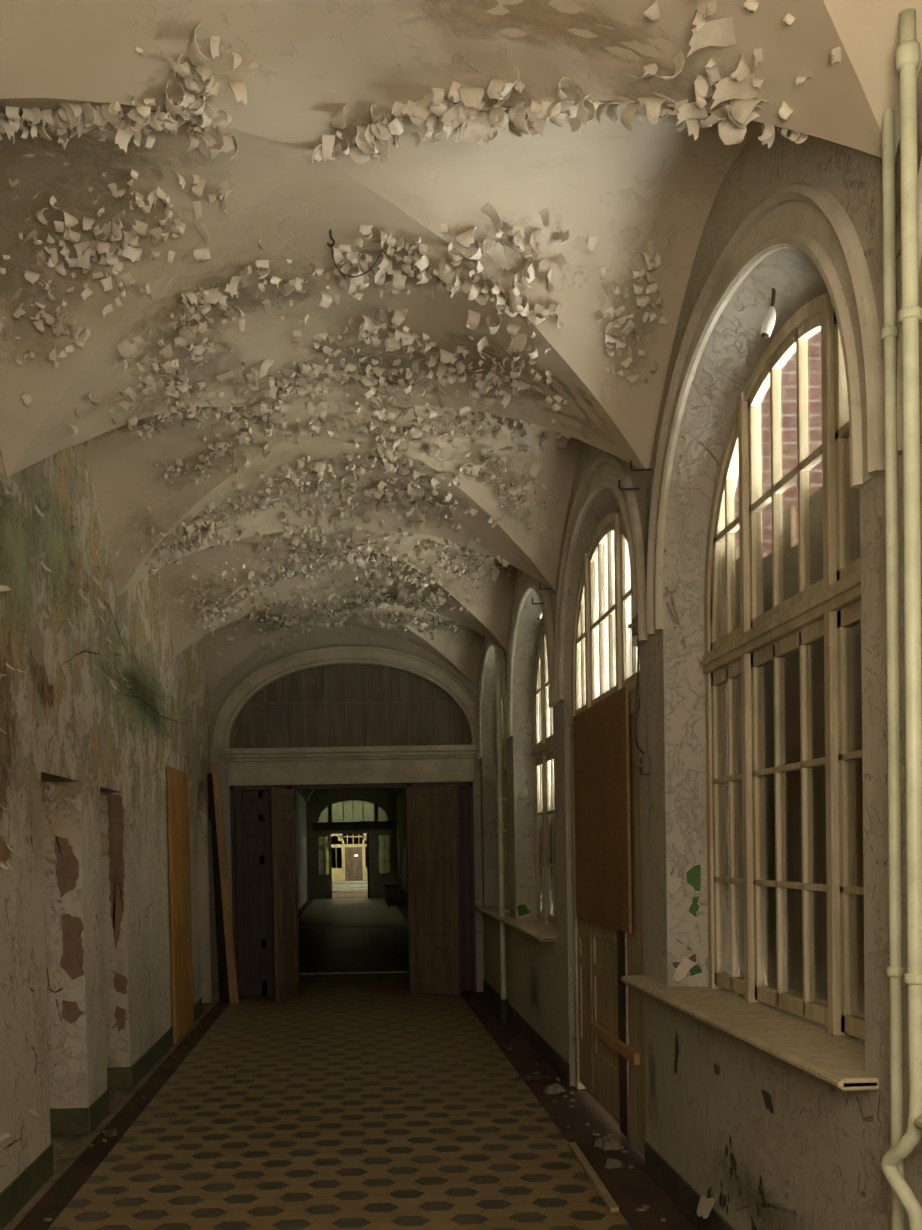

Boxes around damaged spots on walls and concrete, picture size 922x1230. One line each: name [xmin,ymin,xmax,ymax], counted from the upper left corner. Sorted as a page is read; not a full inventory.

peeling [0,21,258,161]
peeling [312,0,808,165]
peeling [830,47,842,66]
peeling [0,169,231,369]
peeling [596,240,668,384]
peeling [68,203,571,657]
damp [0,652,15,814]
damp [31,655,54,708]
peeling [54,835,79,898]
peeling [107,794,125,950]
peeling [60,914,85,980]
peeling [62,1000,85,1024]